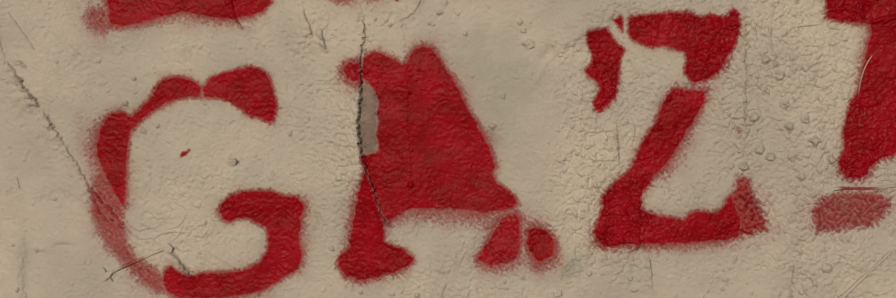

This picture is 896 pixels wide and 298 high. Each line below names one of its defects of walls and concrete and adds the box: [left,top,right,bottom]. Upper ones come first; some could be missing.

crack [228,0,256,31]
crack [300,6,329,53]
crack [394,0,426,28]
crack [0,20,130,232]
crack [351,14,396,228]